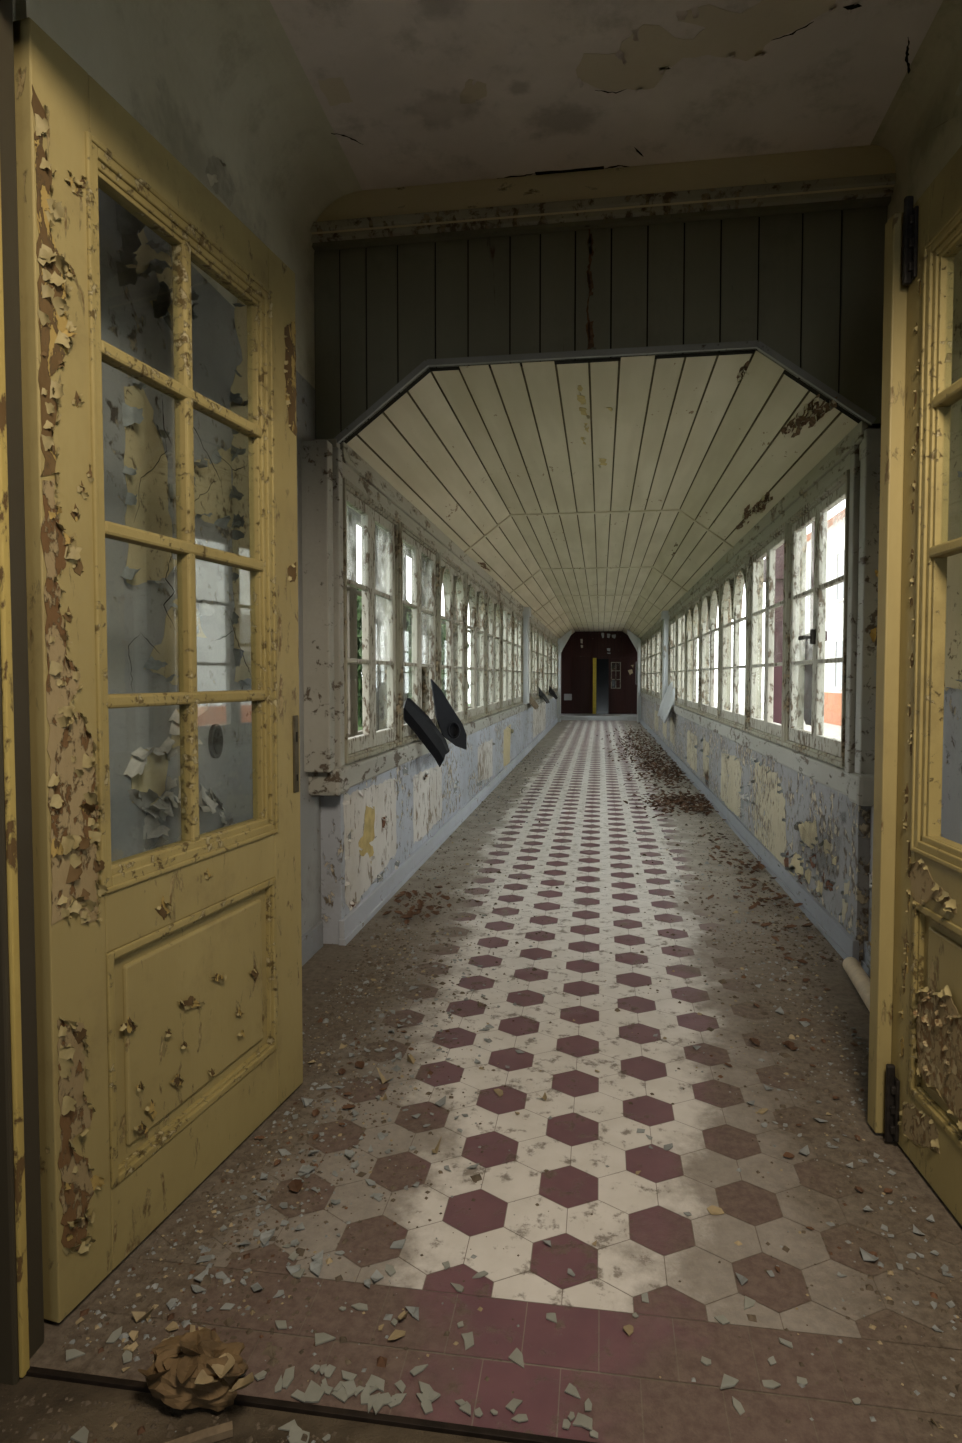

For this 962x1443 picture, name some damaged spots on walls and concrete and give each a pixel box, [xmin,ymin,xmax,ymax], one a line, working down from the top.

peeling [116,203,173,331]
peeling [191,284,199,319]
peeling [31,85,108,926]
peeling [120,382,177,586]
peeling [194,299,251,686]
peeling [944,250,962,695]
peeling [143,598,179,685]
peeling [123,709,181,814]
peeling [342,764,459,911]
peeling [477,724,514,788]
peeling [685,730,872,934]
peeling [57,1017,105,1256]